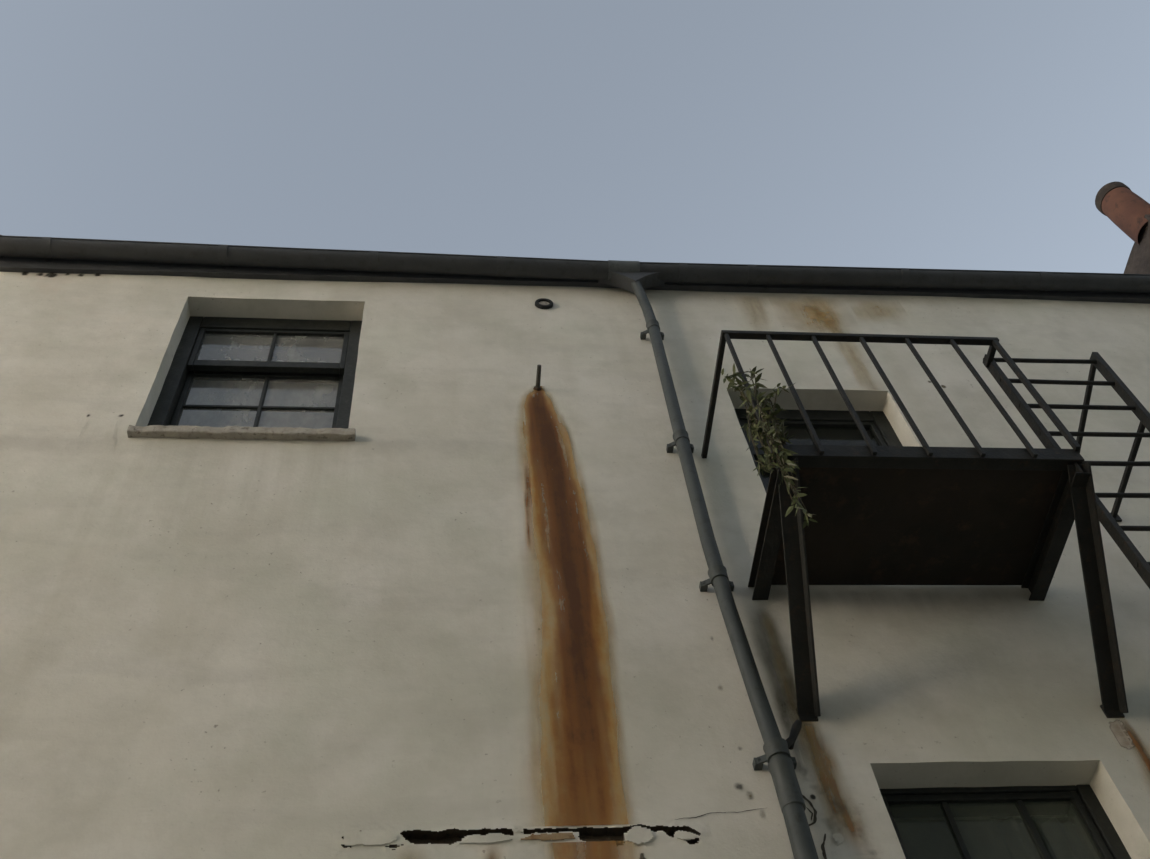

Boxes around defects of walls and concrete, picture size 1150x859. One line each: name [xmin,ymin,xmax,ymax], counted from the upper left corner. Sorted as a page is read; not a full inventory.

rust [522,386,629,826]
rust [1125,728,1150,773]
rust [805,725,856,836]
crack [331,808,763,859]
rust [551,841,623,859]